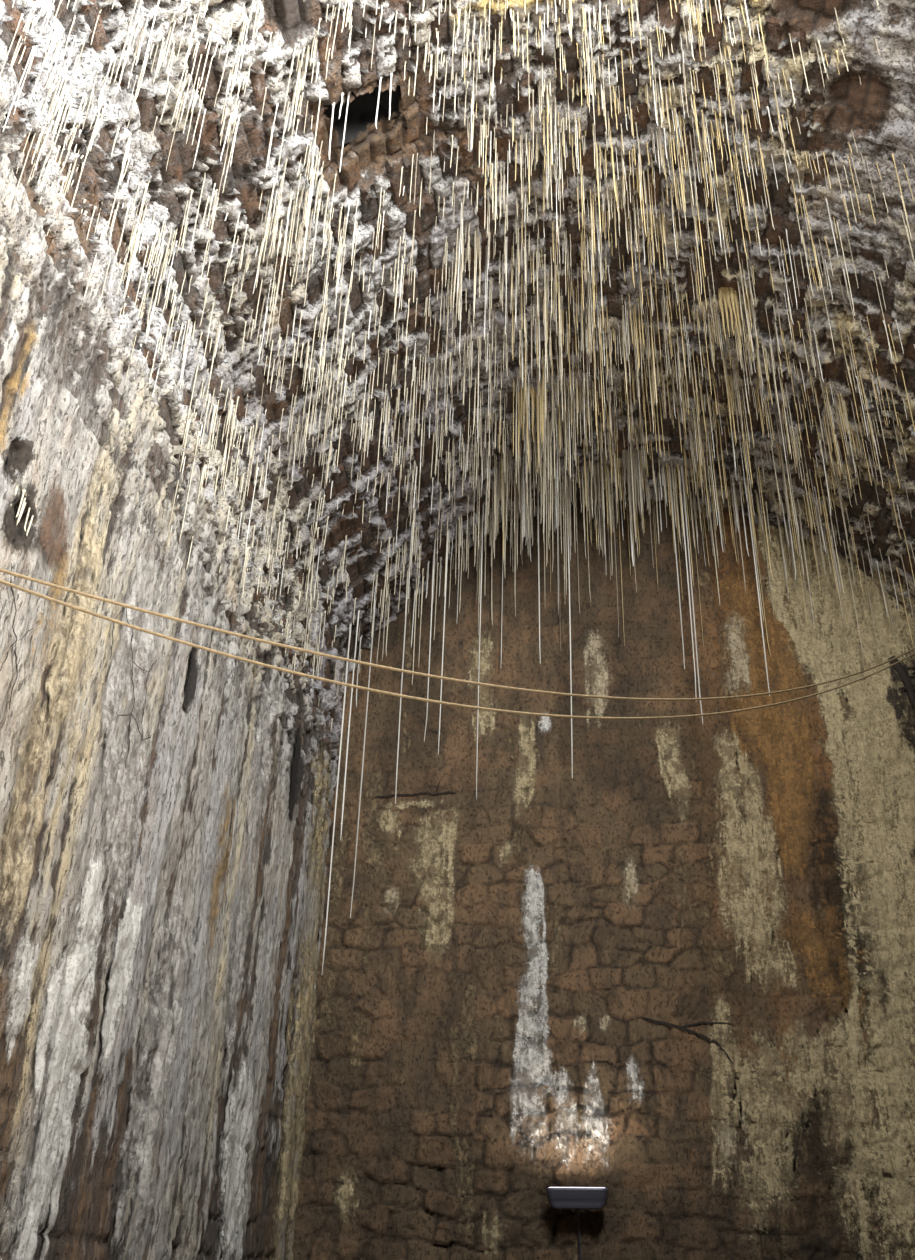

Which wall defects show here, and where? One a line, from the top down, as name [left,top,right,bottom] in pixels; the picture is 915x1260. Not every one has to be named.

water stain [468,0,543,14]
spalling [321,92,418,165]
spalling [5,437,70,568]
water stain [624,861,638,903]
water stain [707,523,915,1260]
water stain [510,865,611,1165]
water stain [626,1060,643,1099]